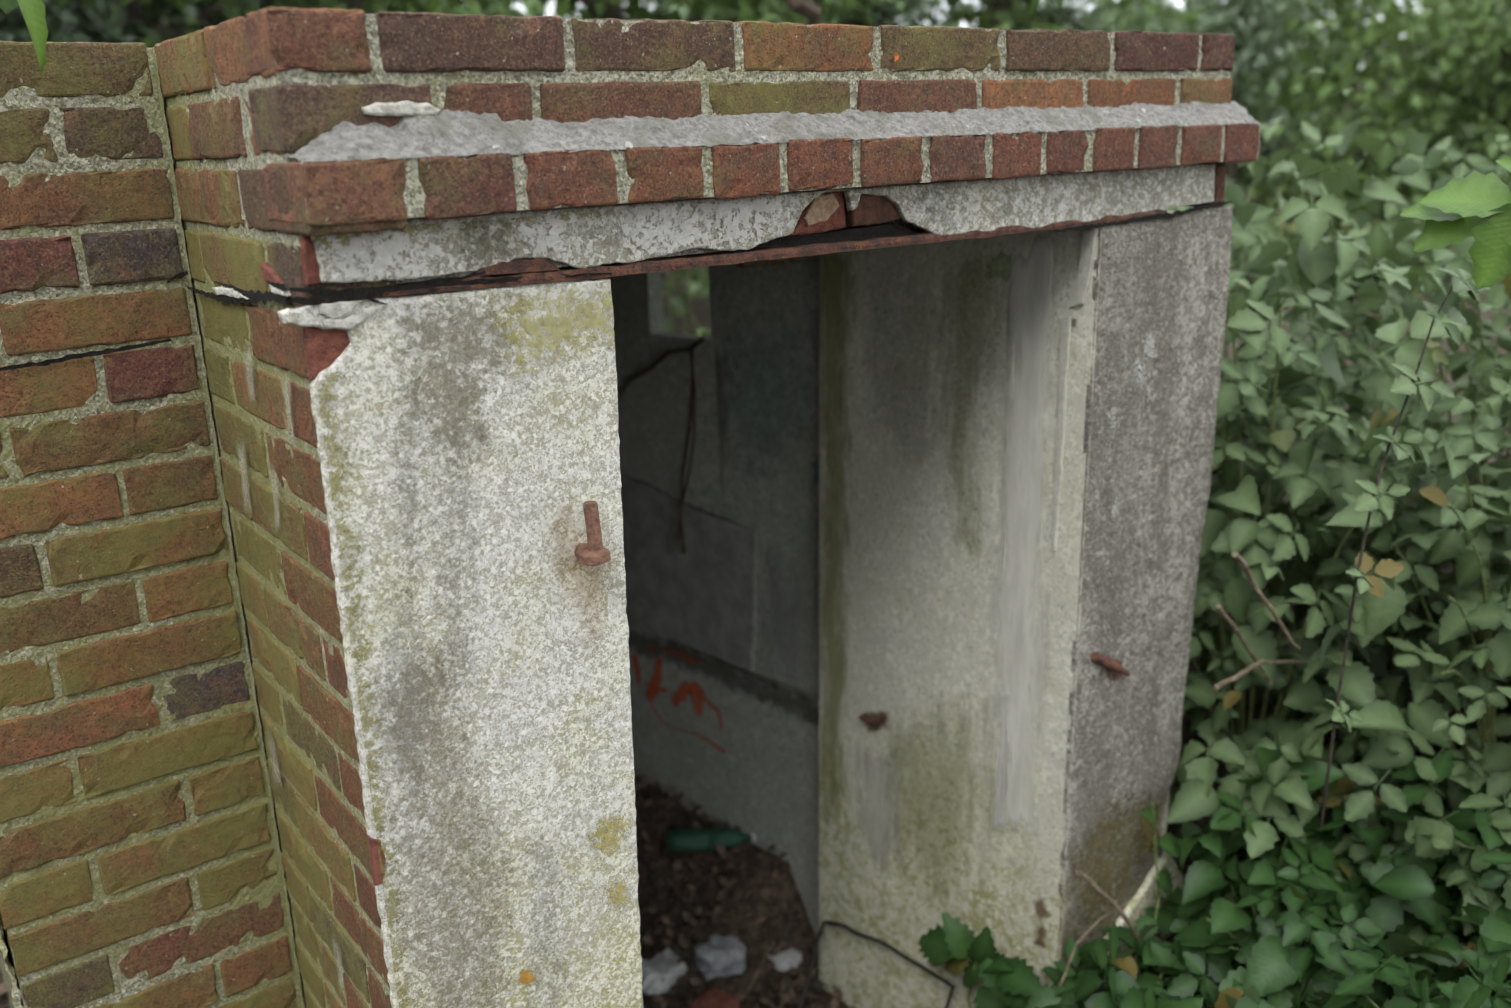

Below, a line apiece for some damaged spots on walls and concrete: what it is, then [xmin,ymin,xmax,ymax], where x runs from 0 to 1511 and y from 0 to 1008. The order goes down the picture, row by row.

spalling [616,190,920,259]
corrosion [456,258,563,281]
crack [561,271,612,279]
crack [167,271,523,320]
crack [0,339,172,371]